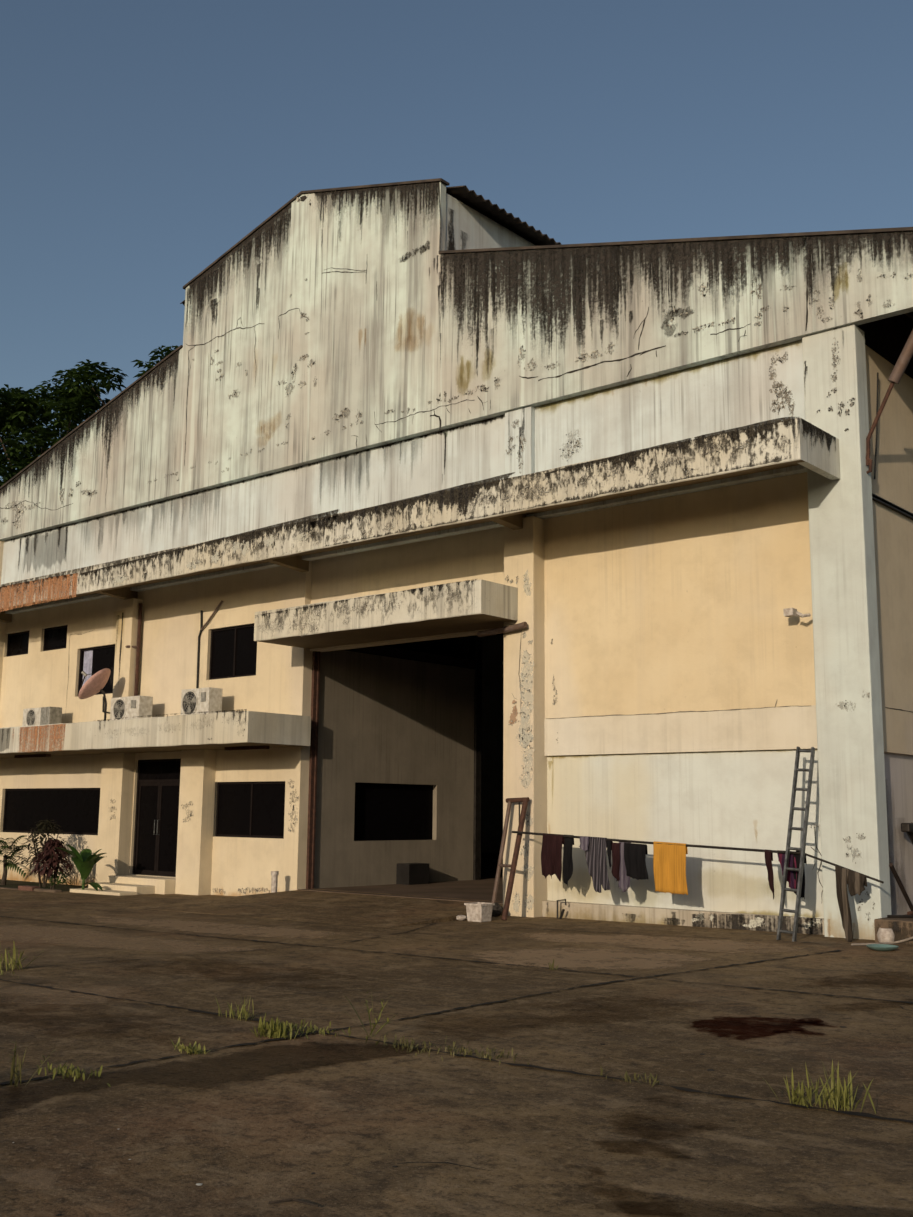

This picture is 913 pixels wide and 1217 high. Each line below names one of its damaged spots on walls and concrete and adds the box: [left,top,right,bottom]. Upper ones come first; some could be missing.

damp [186,203,292,323]
crack [520,307,665,381]
damp [315,182,913,369]
damp [0,351,179,494]
damp [0,415,836,598]
rust [0,573,78,612]
rust [19,724,65,753]
peeling [508,632,533,787]